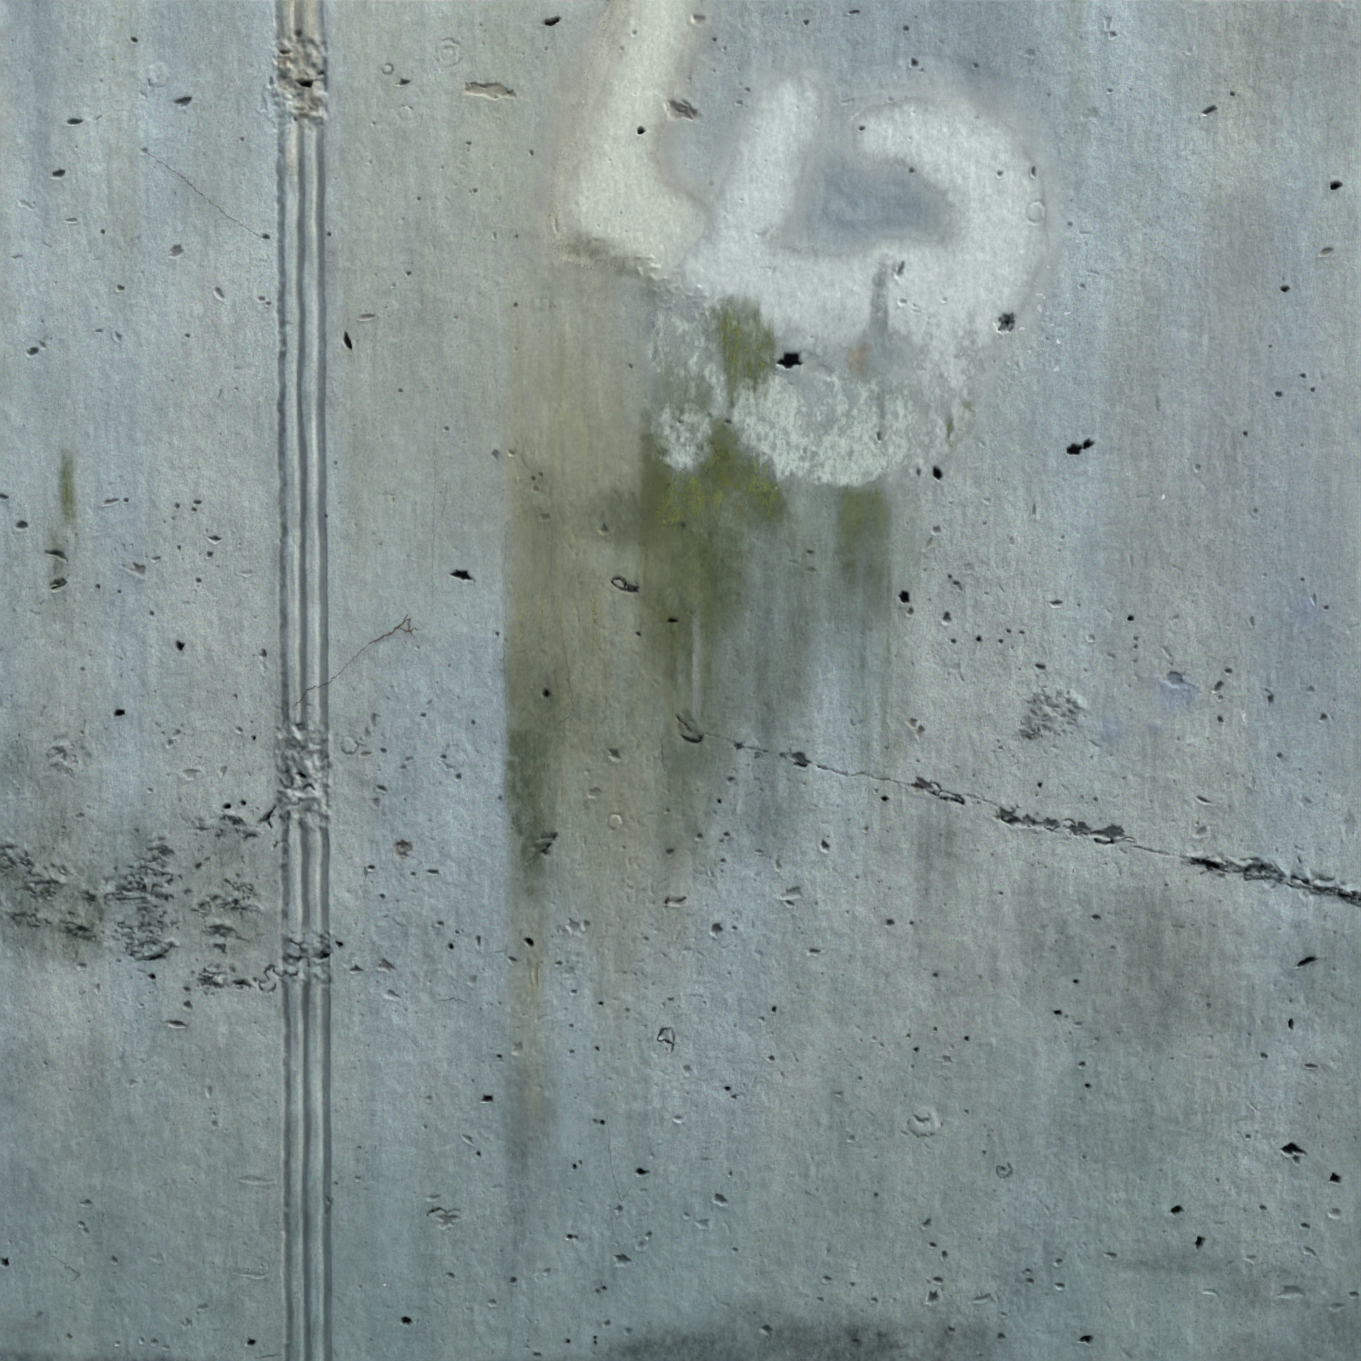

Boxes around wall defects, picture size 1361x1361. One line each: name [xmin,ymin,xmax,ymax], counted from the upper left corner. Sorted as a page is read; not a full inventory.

spalling [273,18,325,146]
leakage [745,451,785,522]
peeling [0,844,69,901]
peeling [9,912,92,942]
spalling [80,838,330,995]
crack [660,709,1361,913]